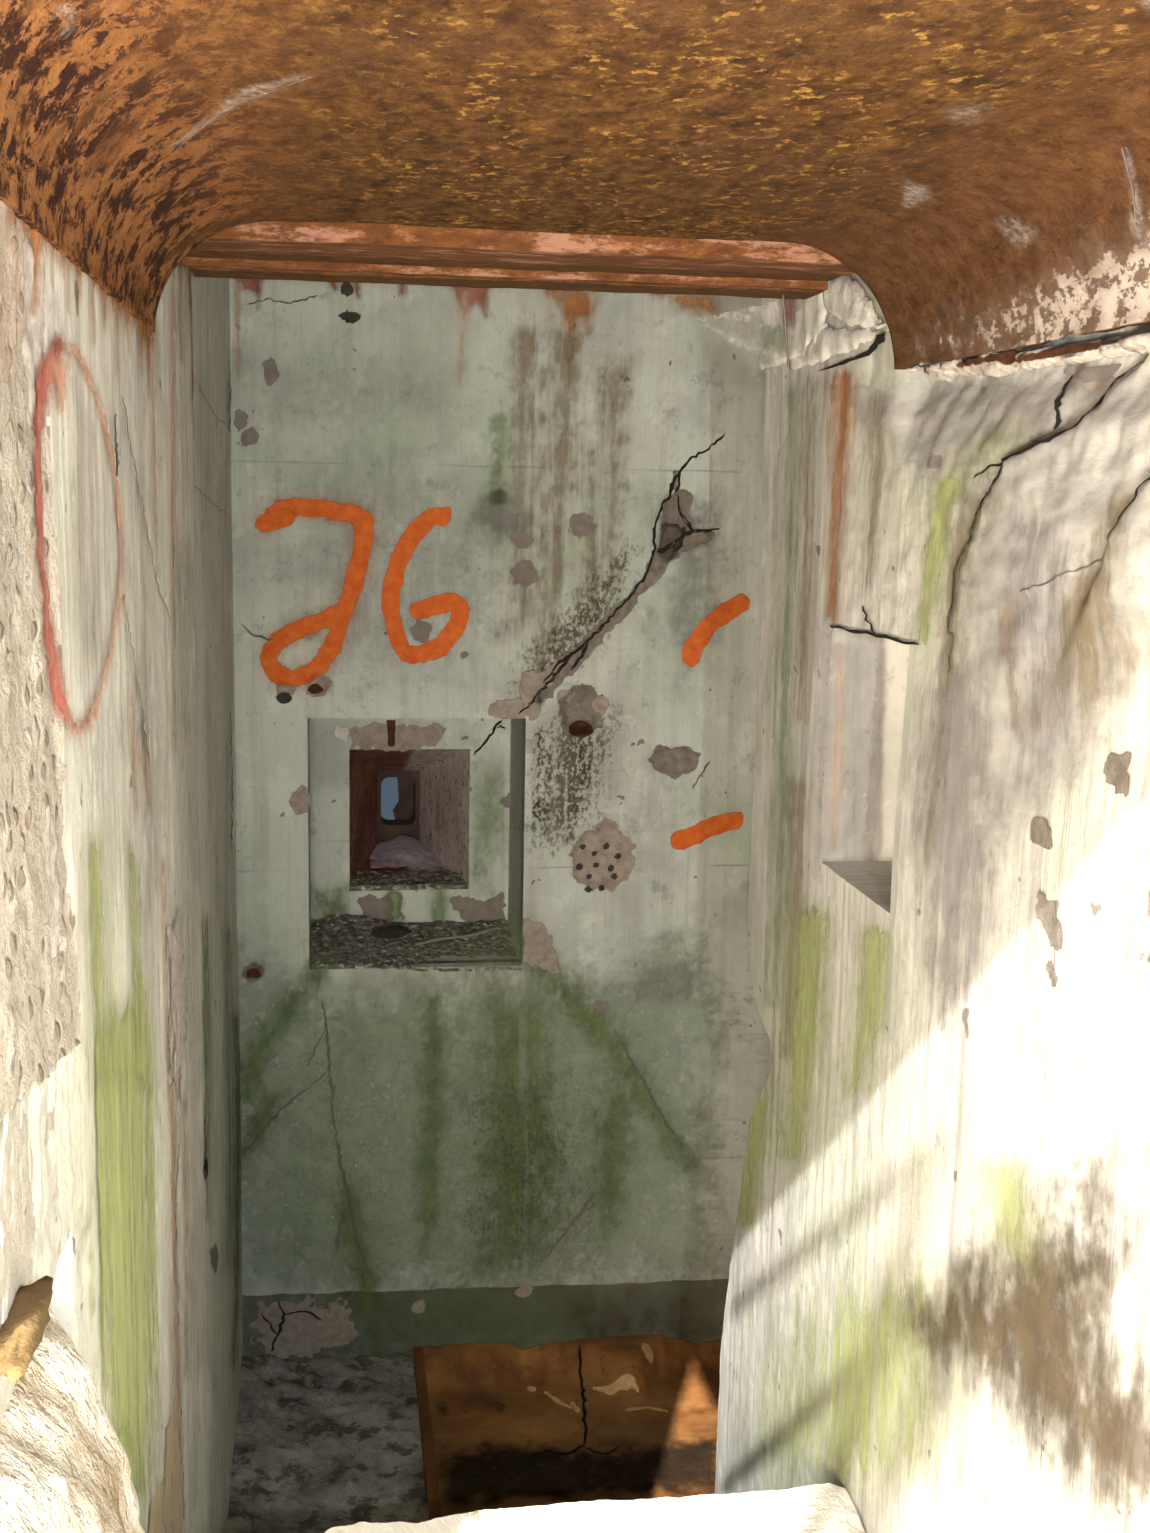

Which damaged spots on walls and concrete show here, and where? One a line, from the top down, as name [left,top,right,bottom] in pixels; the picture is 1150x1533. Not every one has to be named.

rust [9,210,155,370]
rust [454,287,489,316]
rust [547,290,590,331]
crack [817,333,885,371]
spalling [481,470,715,740]
crack [474,433,725,755]
crack [830,361,1150,674]
spalling [569,818,636,893]
leakage [91,841,114,1080]
leakage [129,845,152,1084]
leakage [242,1187,729,1361]
leakage [116,1426,135,1487]